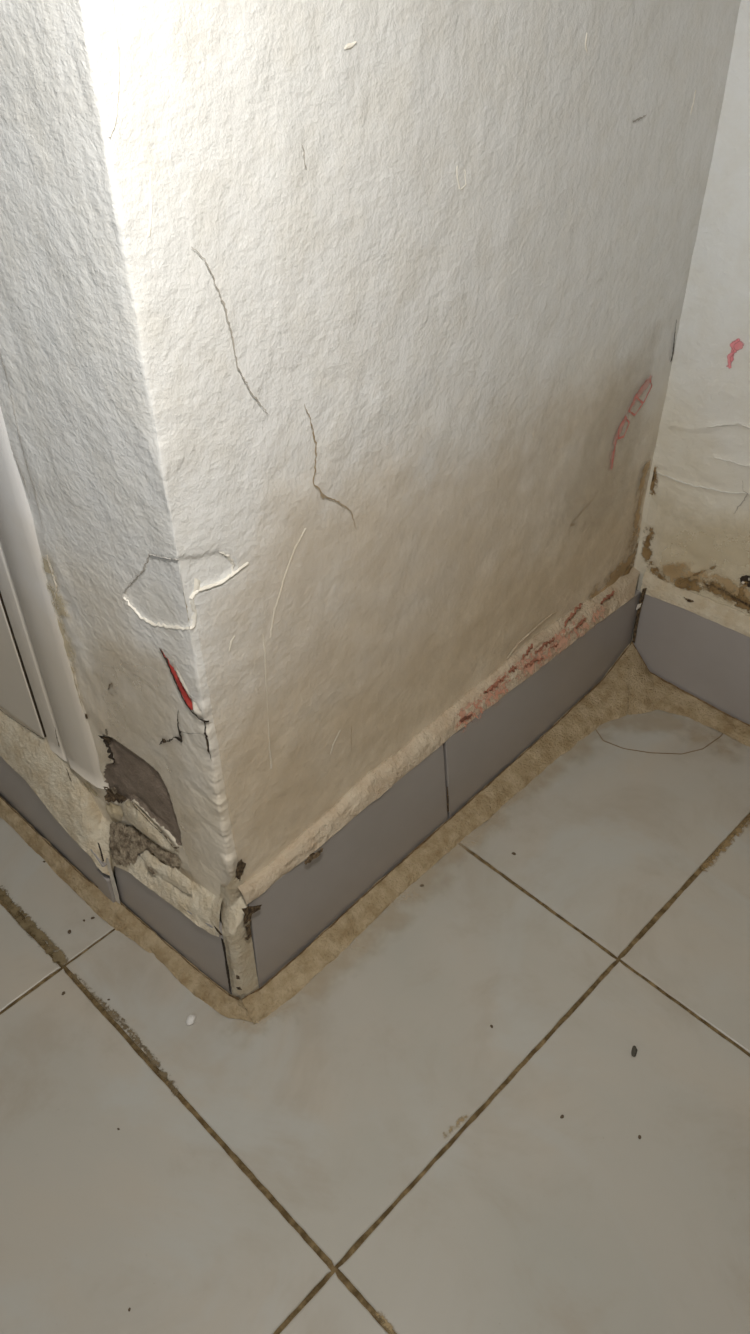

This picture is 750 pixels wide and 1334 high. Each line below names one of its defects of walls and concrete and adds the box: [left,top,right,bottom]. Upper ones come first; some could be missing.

crack [192,247,269,415]
crack [304,404,357,529]
peeling [456,591,615,727]
crack [159,709,200,745]
spalling [98,729,192,895]
peeling [235,859,246,882]
peeling [242,905,262,940]